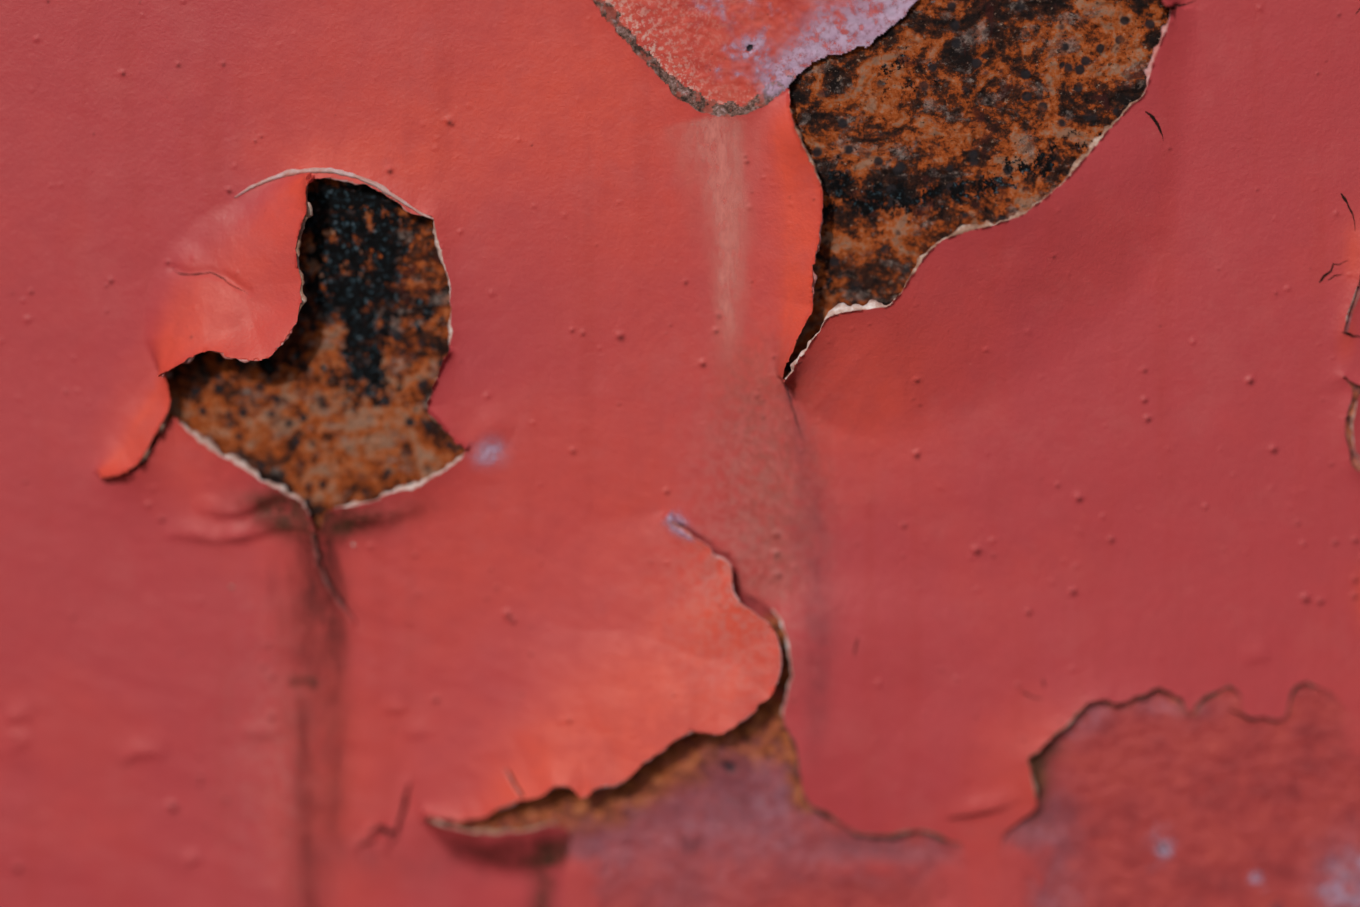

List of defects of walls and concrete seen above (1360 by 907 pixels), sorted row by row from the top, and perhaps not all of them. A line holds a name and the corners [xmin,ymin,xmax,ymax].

peeling [93,153,517,555]
peeling [579,0,1189,387]
crack [311,533,356,621]
crack [358,784,410,848]
peeling [393,505,1360,907]